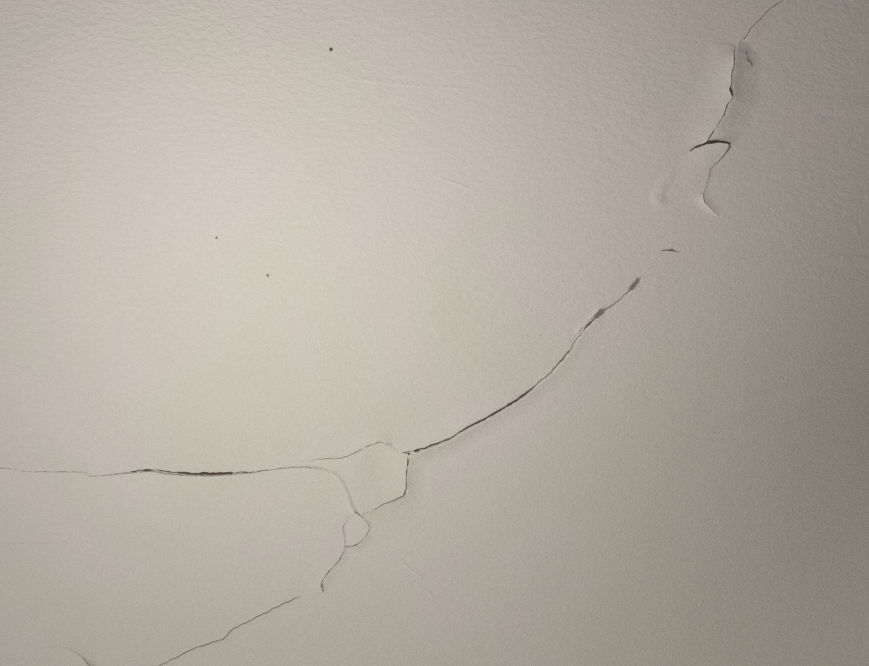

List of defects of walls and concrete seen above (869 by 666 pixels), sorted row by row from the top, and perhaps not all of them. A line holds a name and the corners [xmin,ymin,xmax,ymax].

peeling [649,33,762,217]
crack [392,249,679,465]
crack [156,596,300,666]